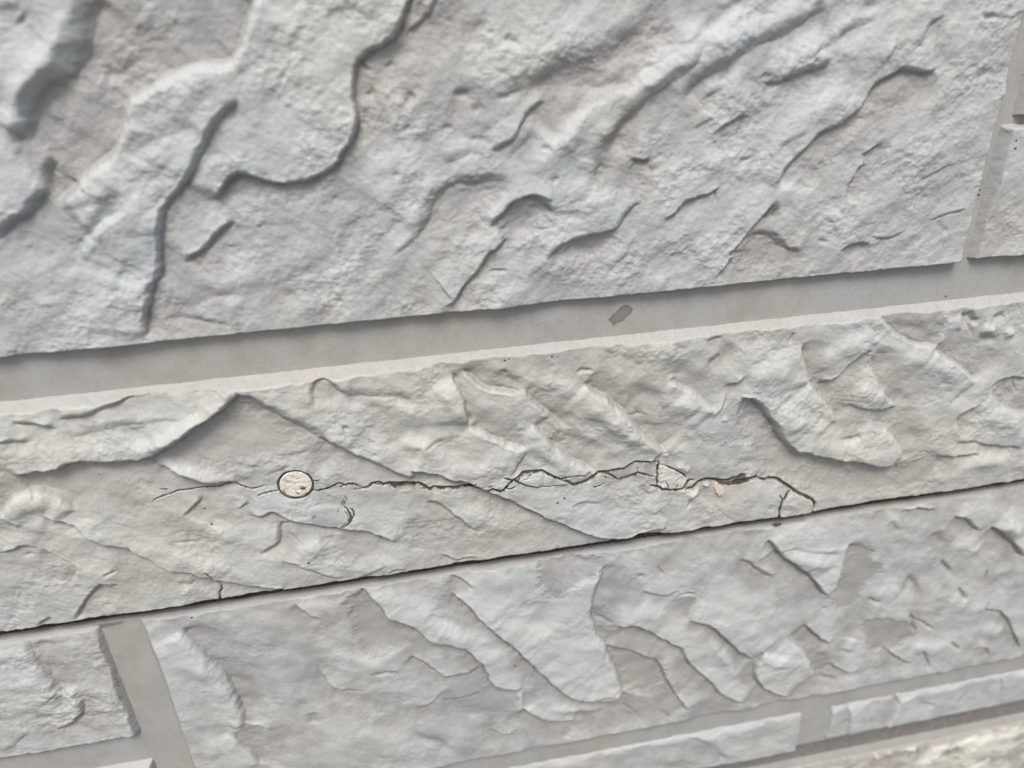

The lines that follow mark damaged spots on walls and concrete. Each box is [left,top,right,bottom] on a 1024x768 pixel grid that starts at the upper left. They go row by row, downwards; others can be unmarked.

crack [152,482,278,502]
crack [313,461,815,516]